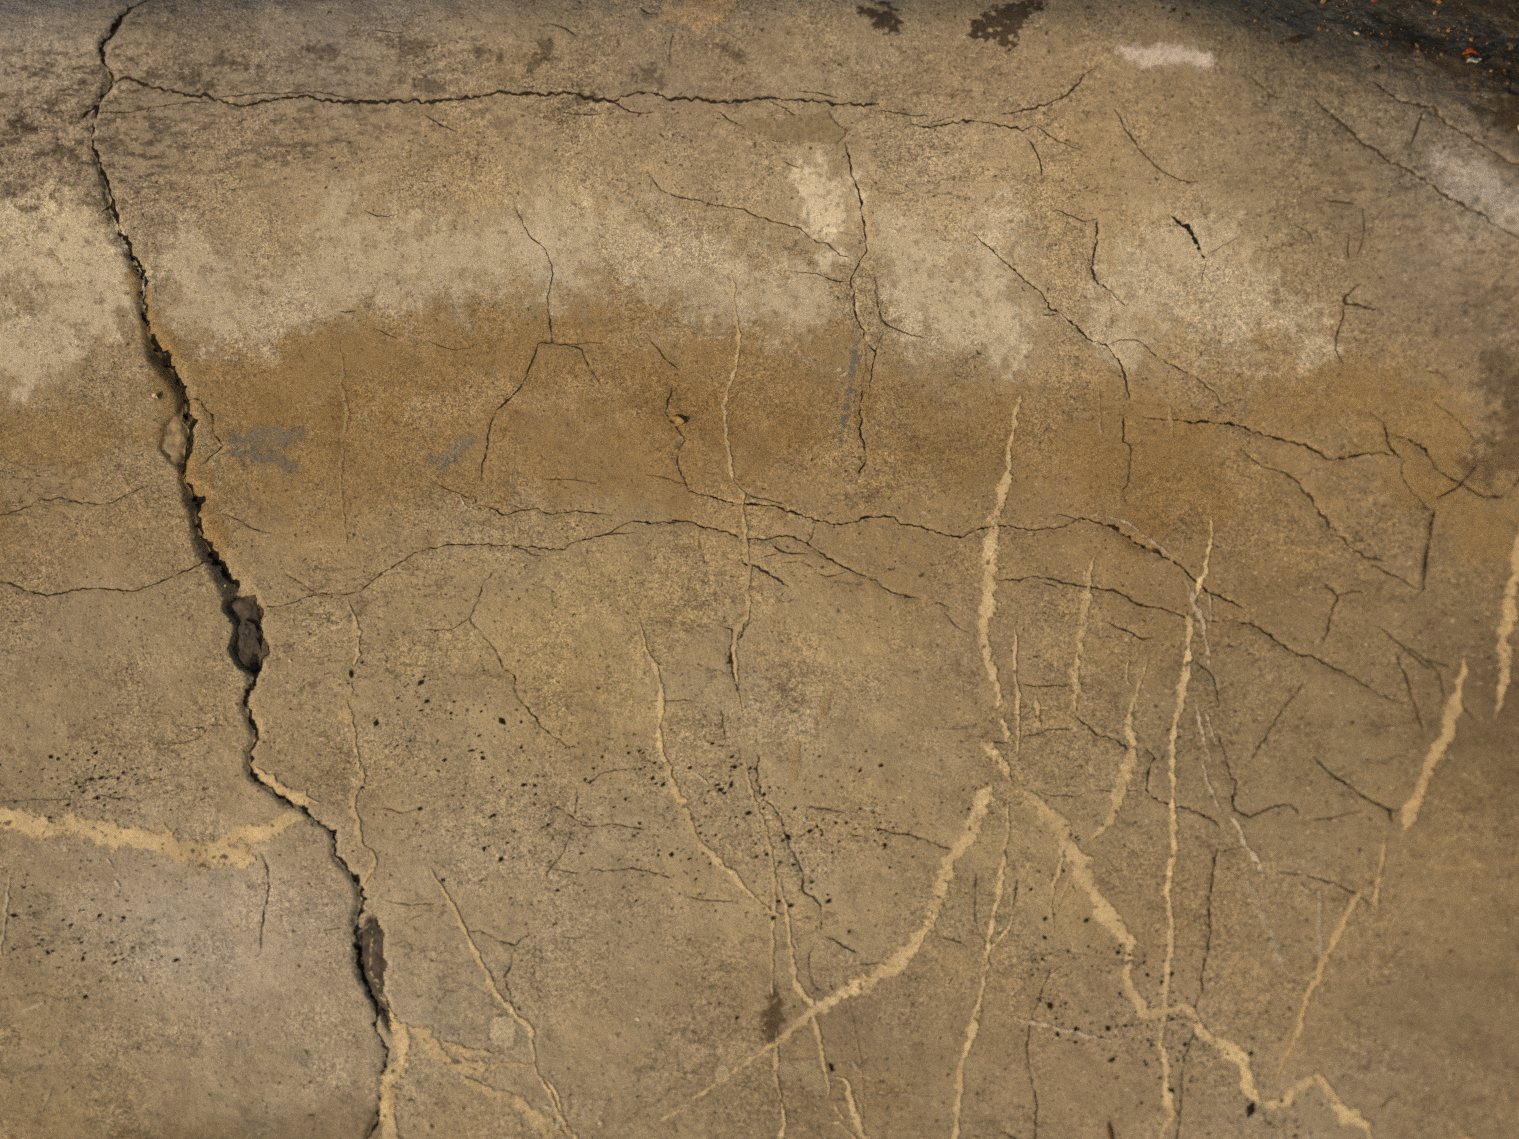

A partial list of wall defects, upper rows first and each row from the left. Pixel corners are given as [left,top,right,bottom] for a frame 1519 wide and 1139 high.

water stain [1115,41,1214,71]
crack [1114,109,1202,183]
crack [1248,75,1519,238]
water stain [1433,154,1519,227]
water stain [0,147,1048,442]
crack [0,0,1093,597]
water stain [1086,212,1343,386]
water stain [179,433,228,550]
crack [154,198,1519,1139]
crack [2,774,174,802]